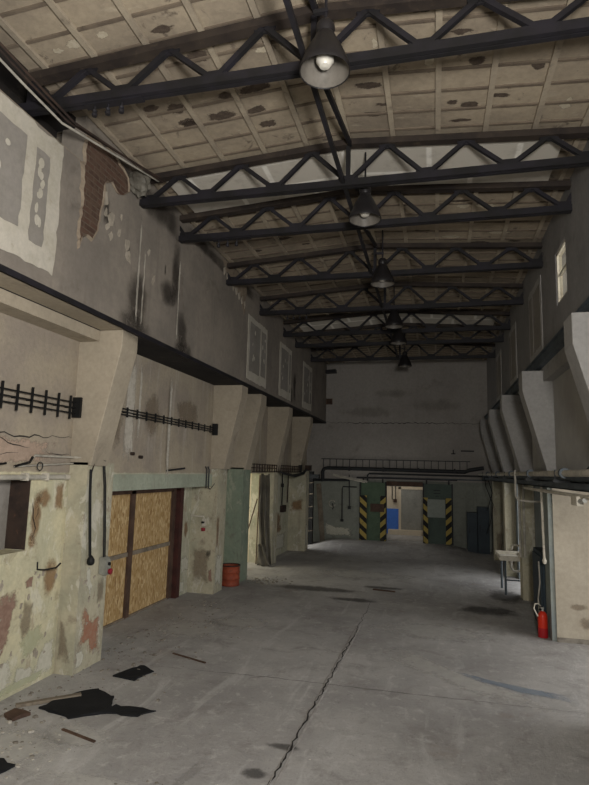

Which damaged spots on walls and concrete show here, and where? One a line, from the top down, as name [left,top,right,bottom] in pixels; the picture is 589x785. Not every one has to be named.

spalling [76,135,131,264]
crack [0,431,69,455]
peeling [0,571,45,669]
peeling [74,561,100,668]
crack [162,603,581,785]